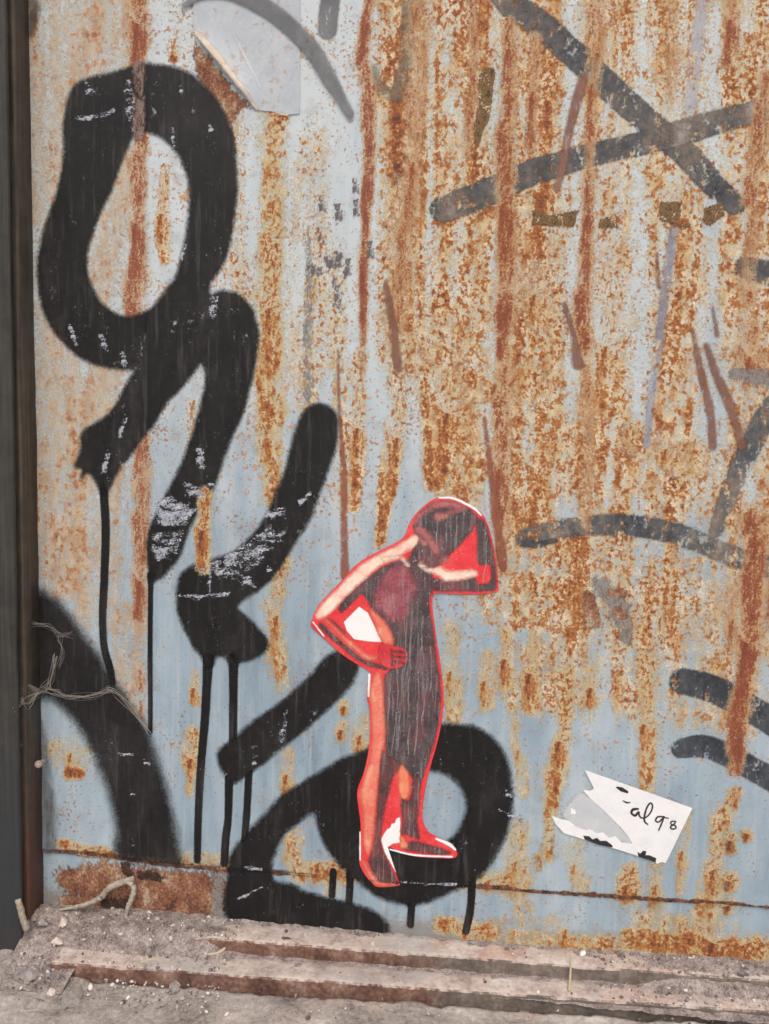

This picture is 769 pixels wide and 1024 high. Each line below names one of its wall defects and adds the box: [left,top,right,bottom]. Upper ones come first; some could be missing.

rust [167,38,179,65]
rust [29,0,171,317]
rust [186,400,200,441]
rust [34,296,153,716]
rust [192,0,769,962]
rust [189,668,202,707]
rust [178,724,199,798]
rust [42,838,230,918]